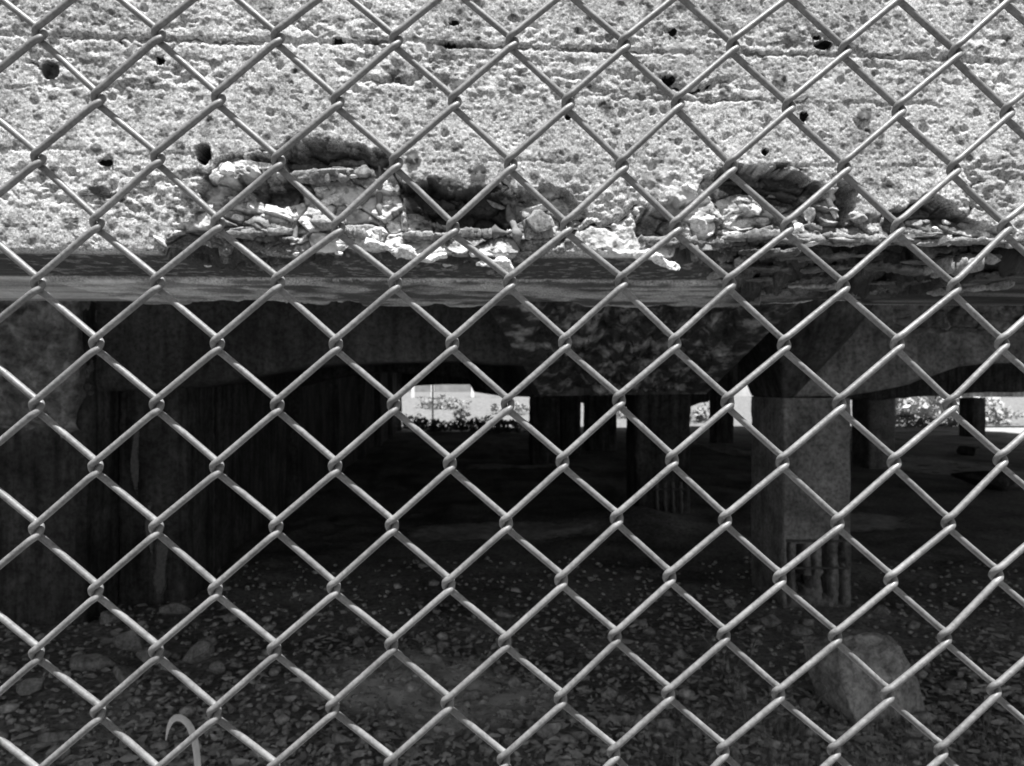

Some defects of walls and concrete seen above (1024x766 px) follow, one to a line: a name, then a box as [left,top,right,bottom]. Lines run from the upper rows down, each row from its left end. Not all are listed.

spalling [153,142,586,278]
spalling [634,167,1024,338]